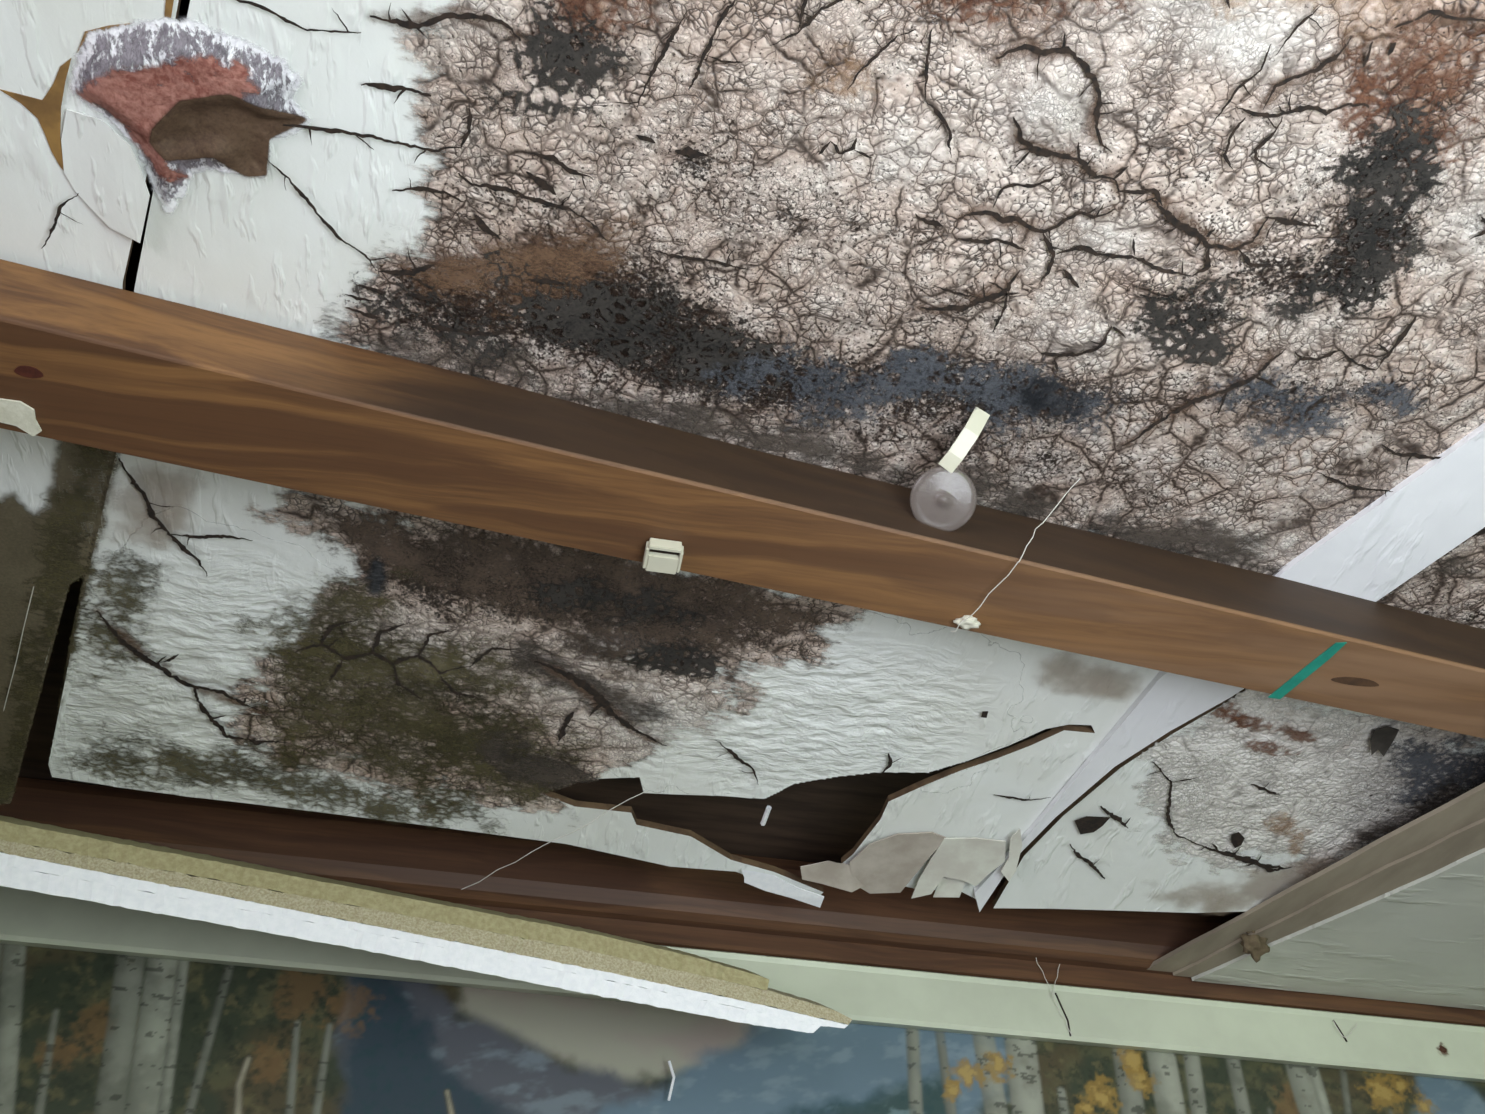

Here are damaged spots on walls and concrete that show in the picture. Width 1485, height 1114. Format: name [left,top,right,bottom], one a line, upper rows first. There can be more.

crack [236,0,521,41]
crack [361,83,431,103]
crack [615,0,952,159]
crack [1213,6,1485,169]
crack [283,109,606,240]
crack [915,33,1318,332]
leakage [322,0,1485,576]
leakage [1377,530,1485,630]
leakage [66,489,866,833]
peeling [800,829,1022,899]
crack [1147,761,1292,873]
leakage [1134,689,1485,877]